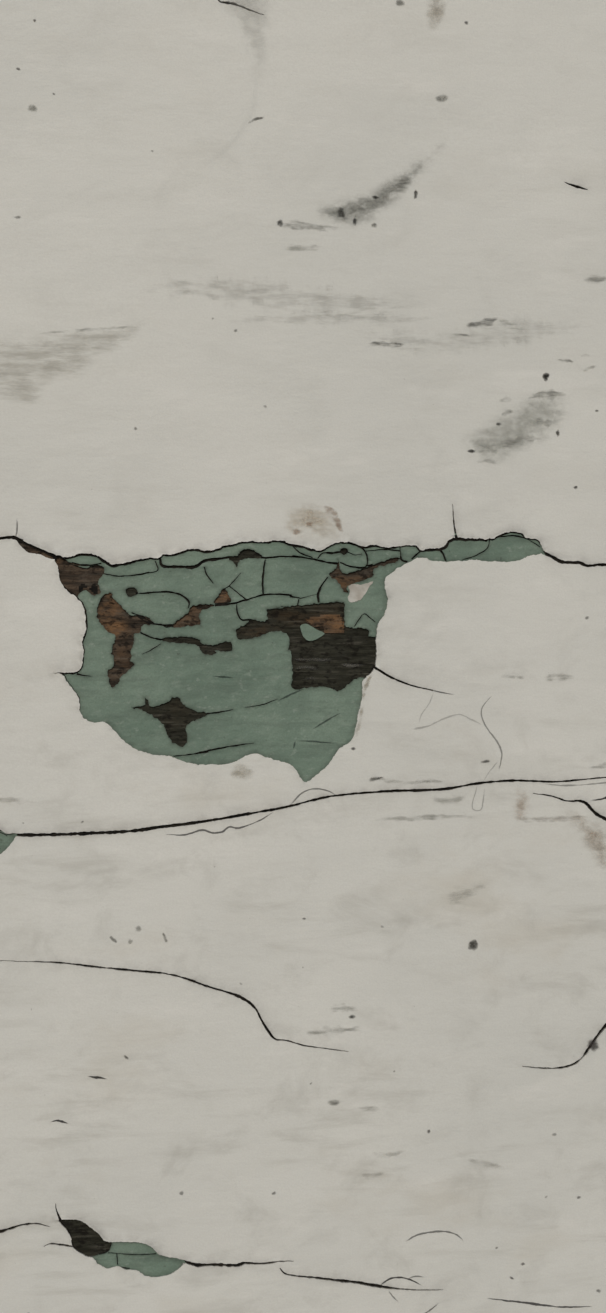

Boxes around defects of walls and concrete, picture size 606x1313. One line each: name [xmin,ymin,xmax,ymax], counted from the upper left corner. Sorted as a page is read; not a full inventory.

peeling [11,532,546,782]
crack [16,777,606,837]
peeling [0,830,17,854]
crack [32,961,343,1051]
crack [525,1023,606,1068]
peeling [0,1204,289,1277]
crack [280,1268,435,1313]